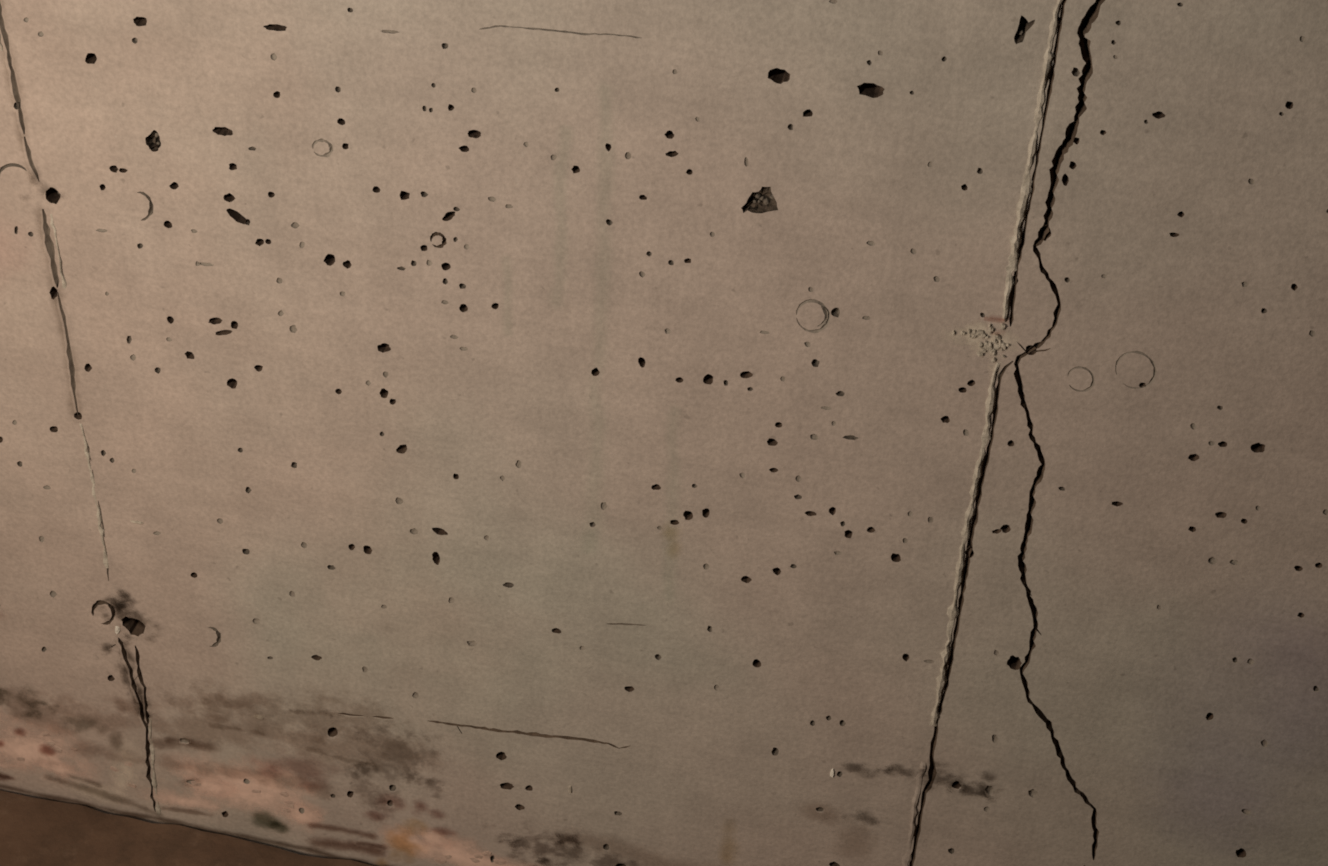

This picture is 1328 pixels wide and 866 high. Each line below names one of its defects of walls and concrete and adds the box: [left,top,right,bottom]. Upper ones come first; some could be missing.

crack [1013,0,1105,866]
water stain [123,653,144,713]
crack [111,638,156,812]